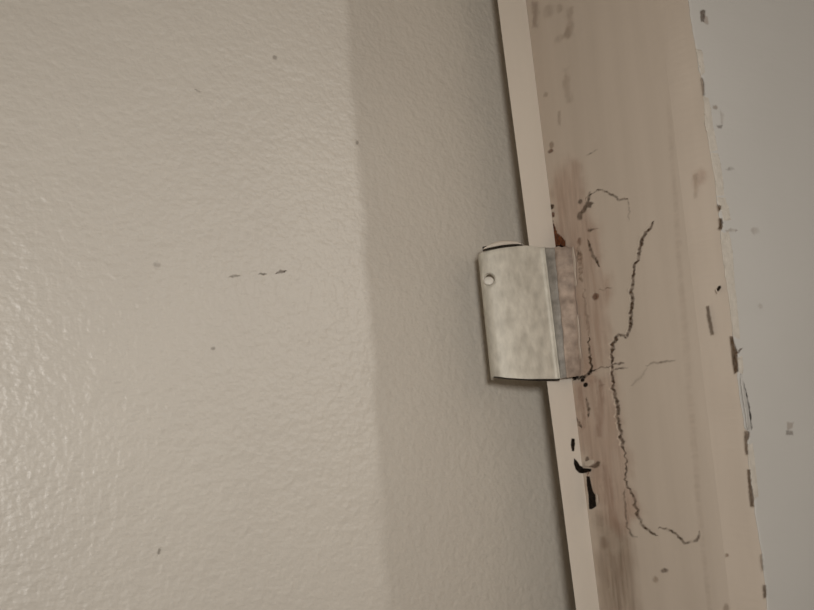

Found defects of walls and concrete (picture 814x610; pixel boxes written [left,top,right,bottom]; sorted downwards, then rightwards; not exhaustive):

peeling [571,439,599,509]
crack [572,221,698,540]